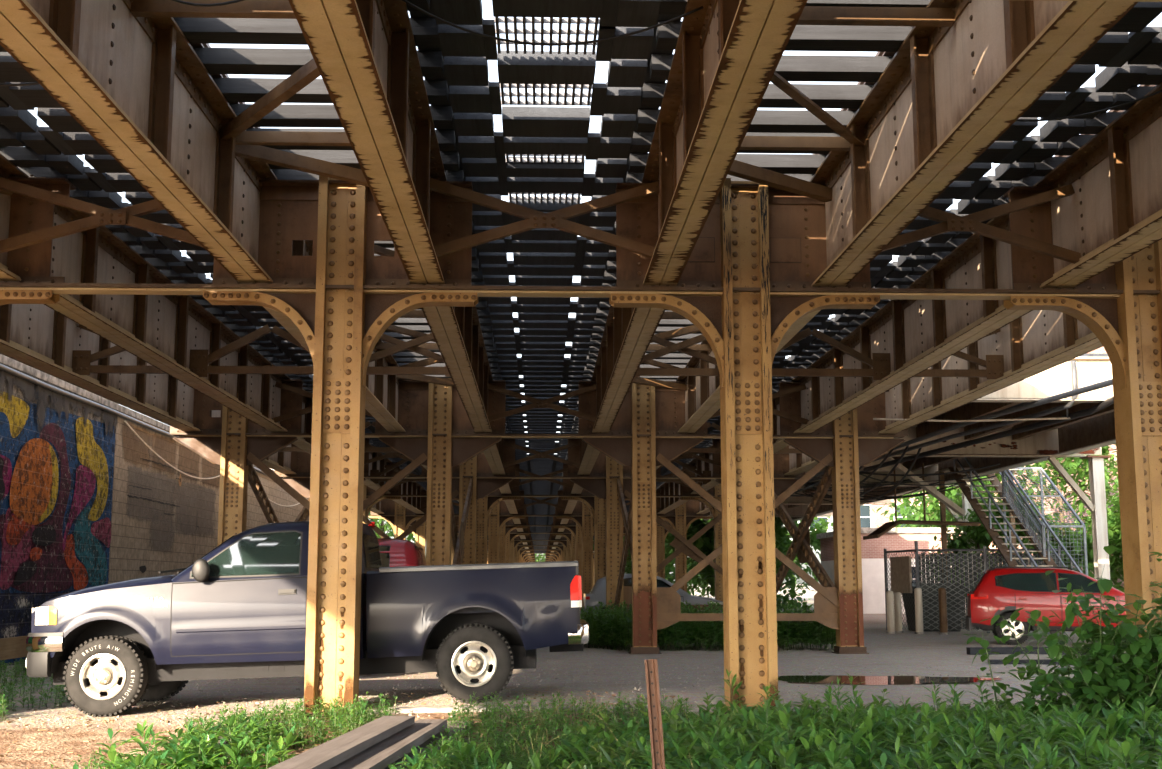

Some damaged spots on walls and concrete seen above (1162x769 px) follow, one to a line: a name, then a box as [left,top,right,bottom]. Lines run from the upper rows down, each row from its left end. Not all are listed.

rust [633,586,657,646]
rust [839,590,864,646]